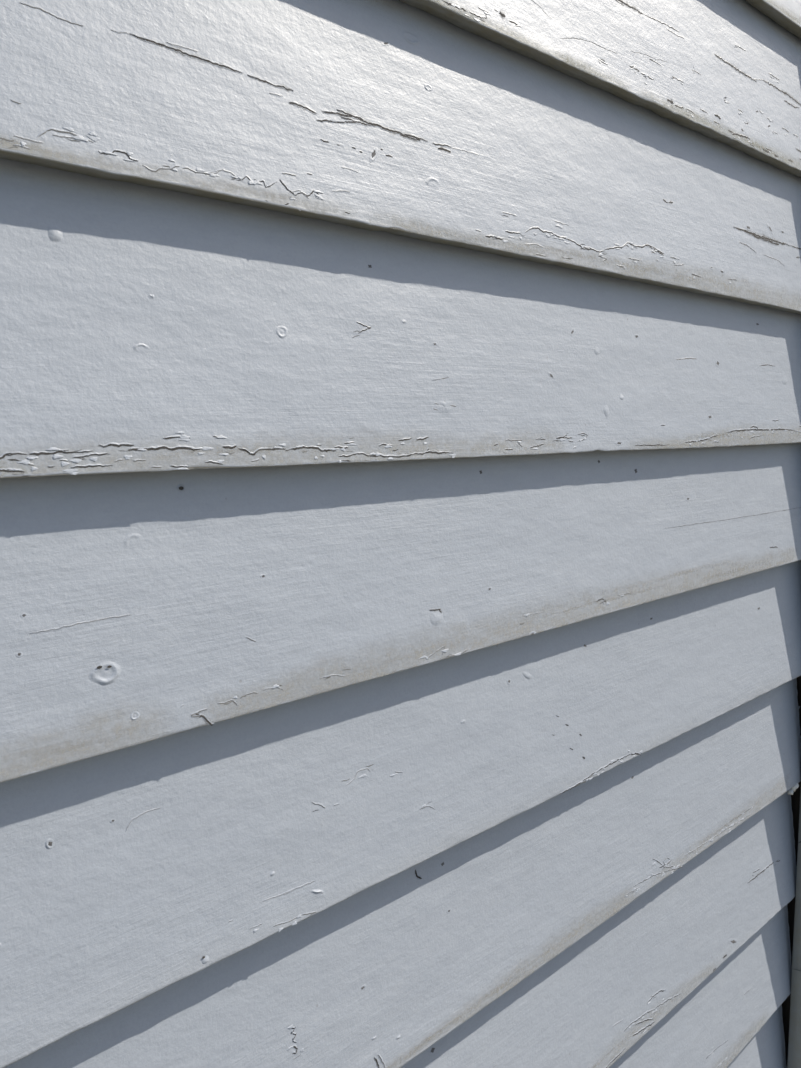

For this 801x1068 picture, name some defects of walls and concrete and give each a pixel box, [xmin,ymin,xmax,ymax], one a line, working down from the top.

peeling [444,0,490,22]
peeling [0,126,323,212]
peeling [476,221,701,279]
peeling [0,431,456,476]
peeling [494,432,588,453]
peeling [685,419,801,445]